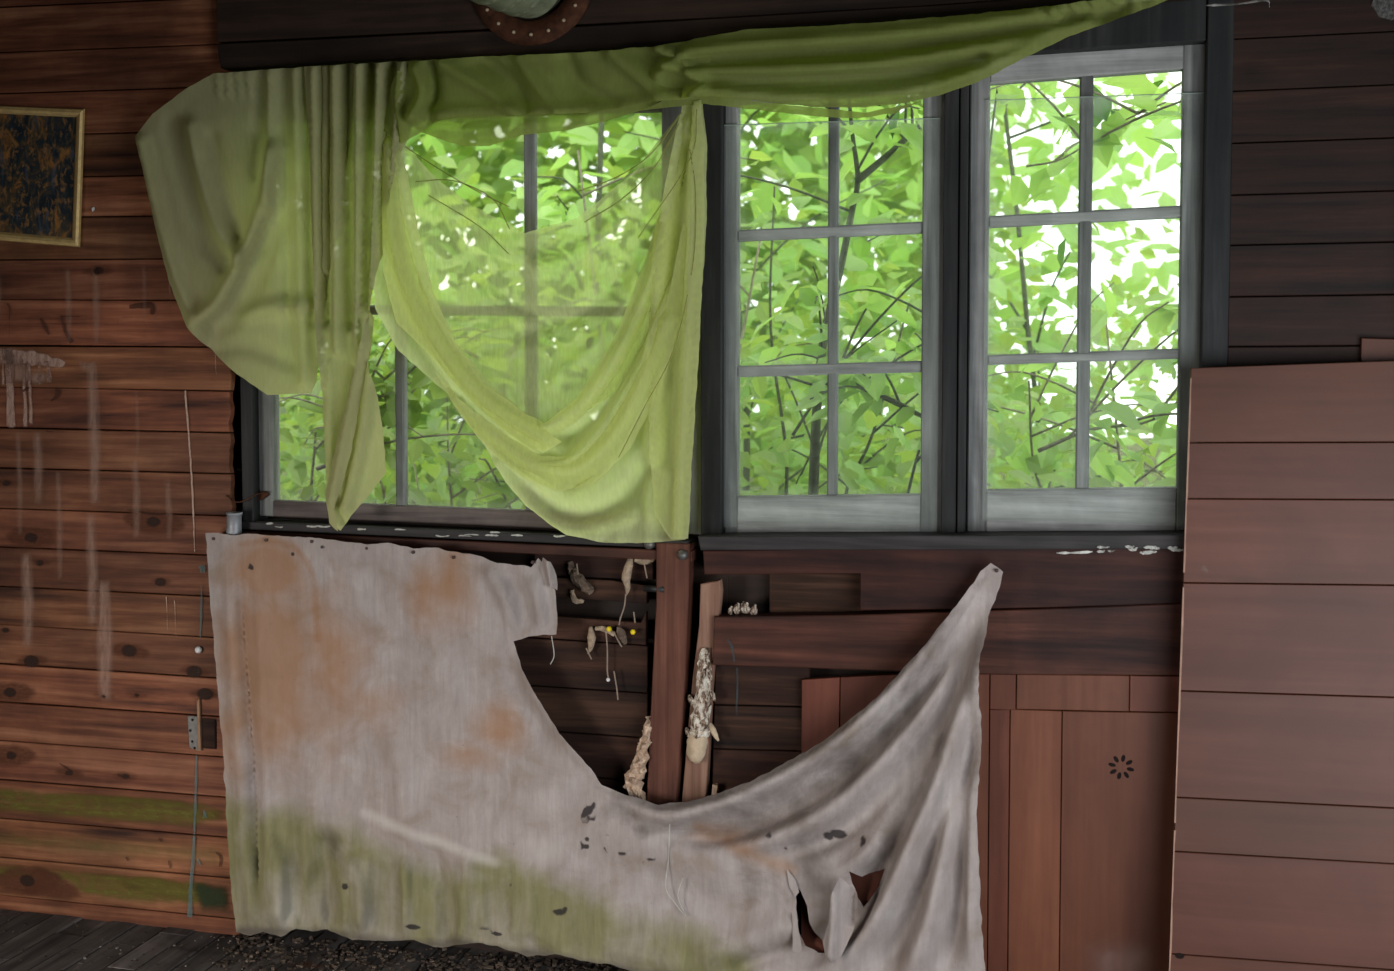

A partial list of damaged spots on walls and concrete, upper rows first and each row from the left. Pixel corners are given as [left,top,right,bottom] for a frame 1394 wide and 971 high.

spalling [623,716,652,800]